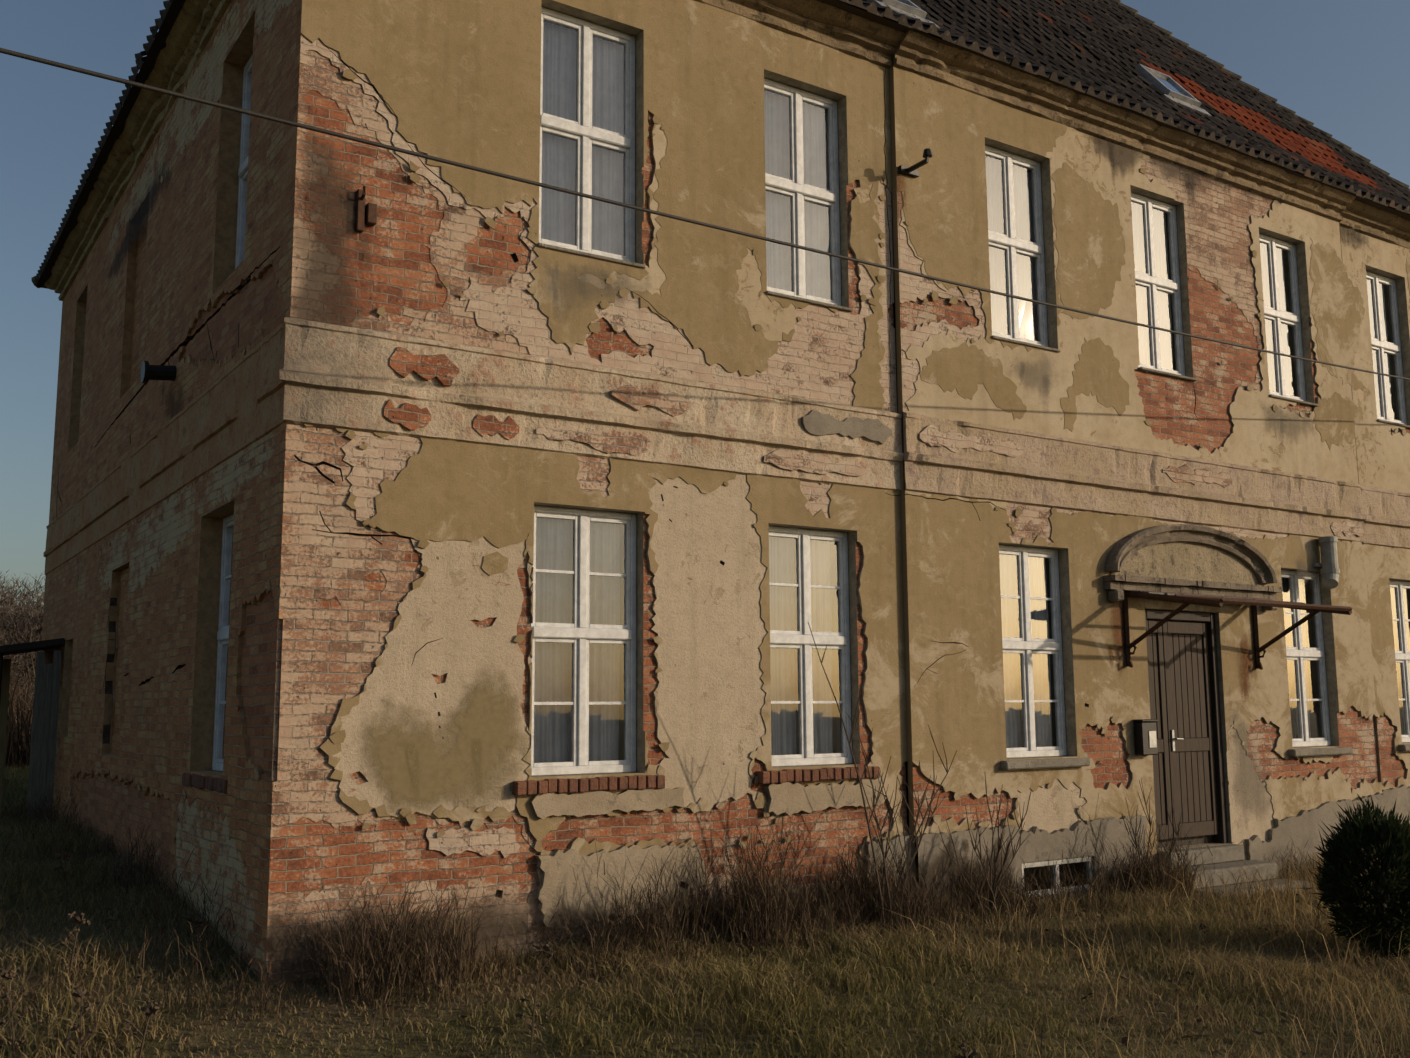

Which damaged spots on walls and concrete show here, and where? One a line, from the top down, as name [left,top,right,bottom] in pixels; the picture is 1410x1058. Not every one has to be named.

crack [94,246,280,448]
peeling [179,33,1410,493]
crack [294,455,414,545]
flaking render [885,490,1289,545]
flaking render [98,399,1133,984]
flaking render [1226,705,1408,845]